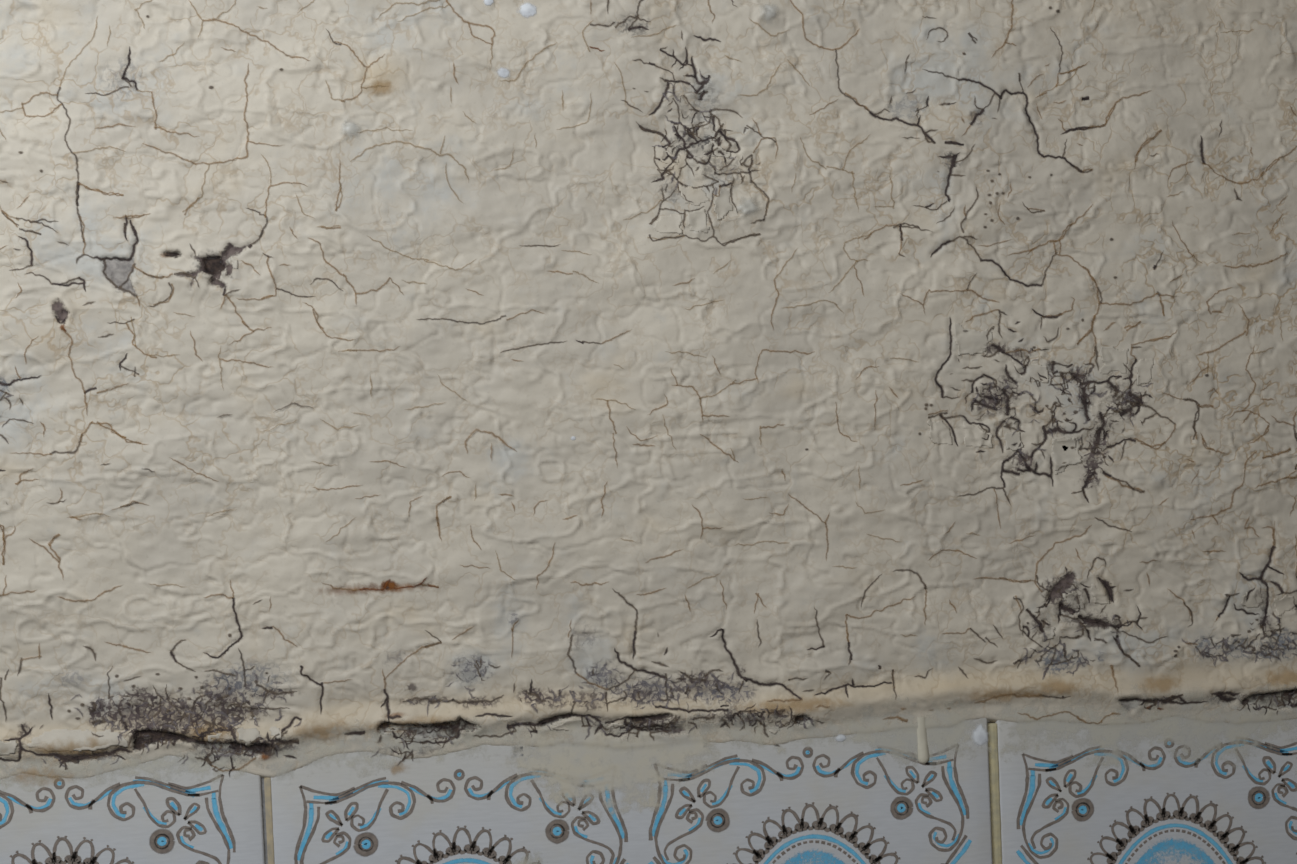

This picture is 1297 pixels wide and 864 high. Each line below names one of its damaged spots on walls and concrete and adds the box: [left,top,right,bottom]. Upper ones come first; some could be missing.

crack [0,0,626,602]
crack [409,0,1297,712]
rust [323,578,439,591]
crack [0,643,41,718]
mould [91,678,292,734]
crack [48,582,347,745]
crack [383,621,518,715]
mould [523,664,724,709]